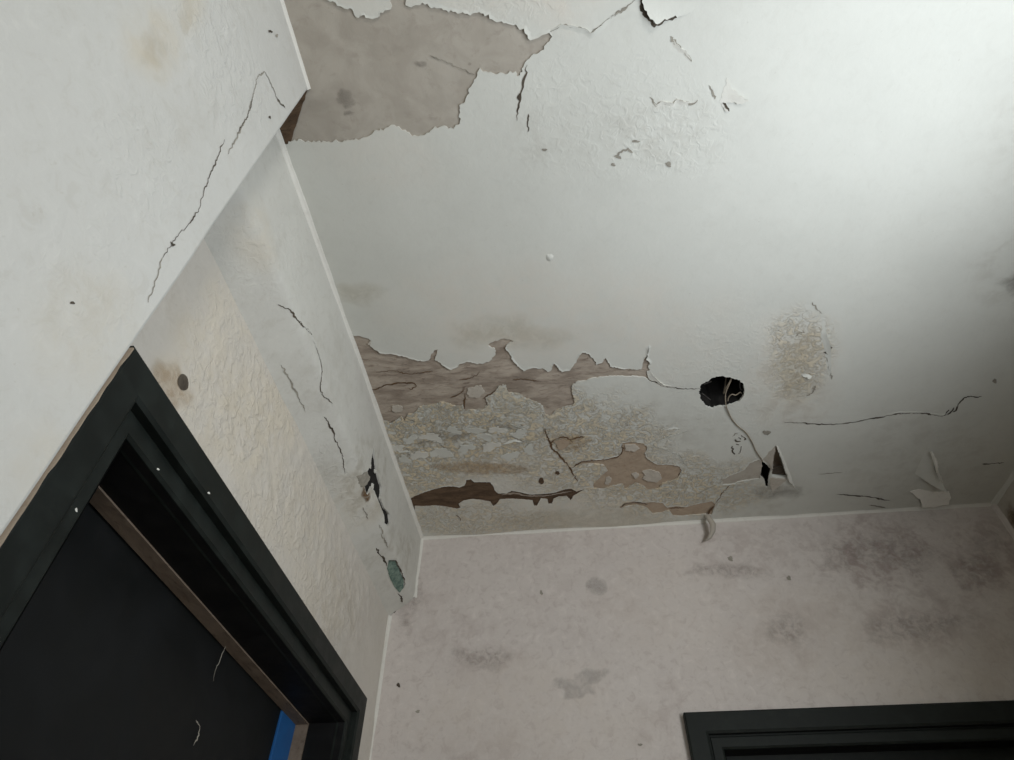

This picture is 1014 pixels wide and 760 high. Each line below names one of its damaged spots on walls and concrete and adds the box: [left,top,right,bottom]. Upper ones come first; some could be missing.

peeling [640,0,698,28]
peeling [284,0,552,142]
crack [148,71,285,303]
crack [279,305,345,471]
spalling [354,336,655,423]
crack [785,379,997,425]
peeling [391,419,534,463]
peeling [574,427,687,489]
spalling [411,477,581,521]
peeling [620,459,762,542]
peeling [376,548,405,613]